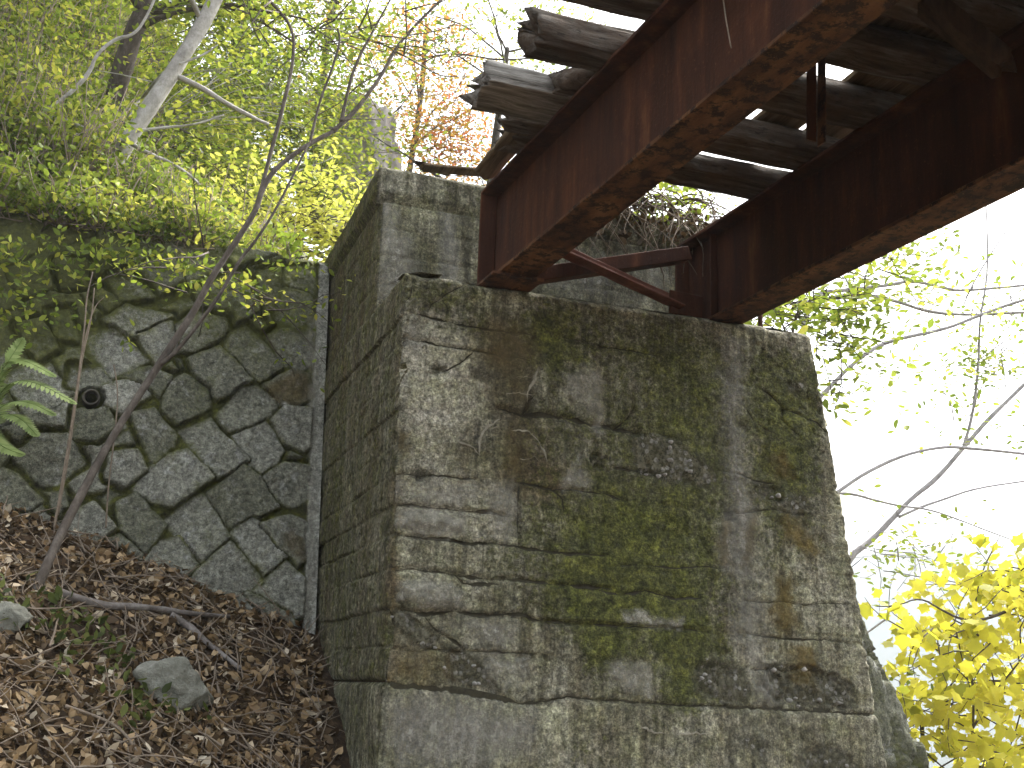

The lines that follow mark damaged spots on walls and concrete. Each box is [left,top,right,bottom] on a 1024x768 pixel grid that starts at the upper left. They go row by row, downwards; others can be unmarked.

crack [745,388,825,435]
crack [396,473,473,481]
crack [392,482,730,654]
leakage [726,446,750,574]